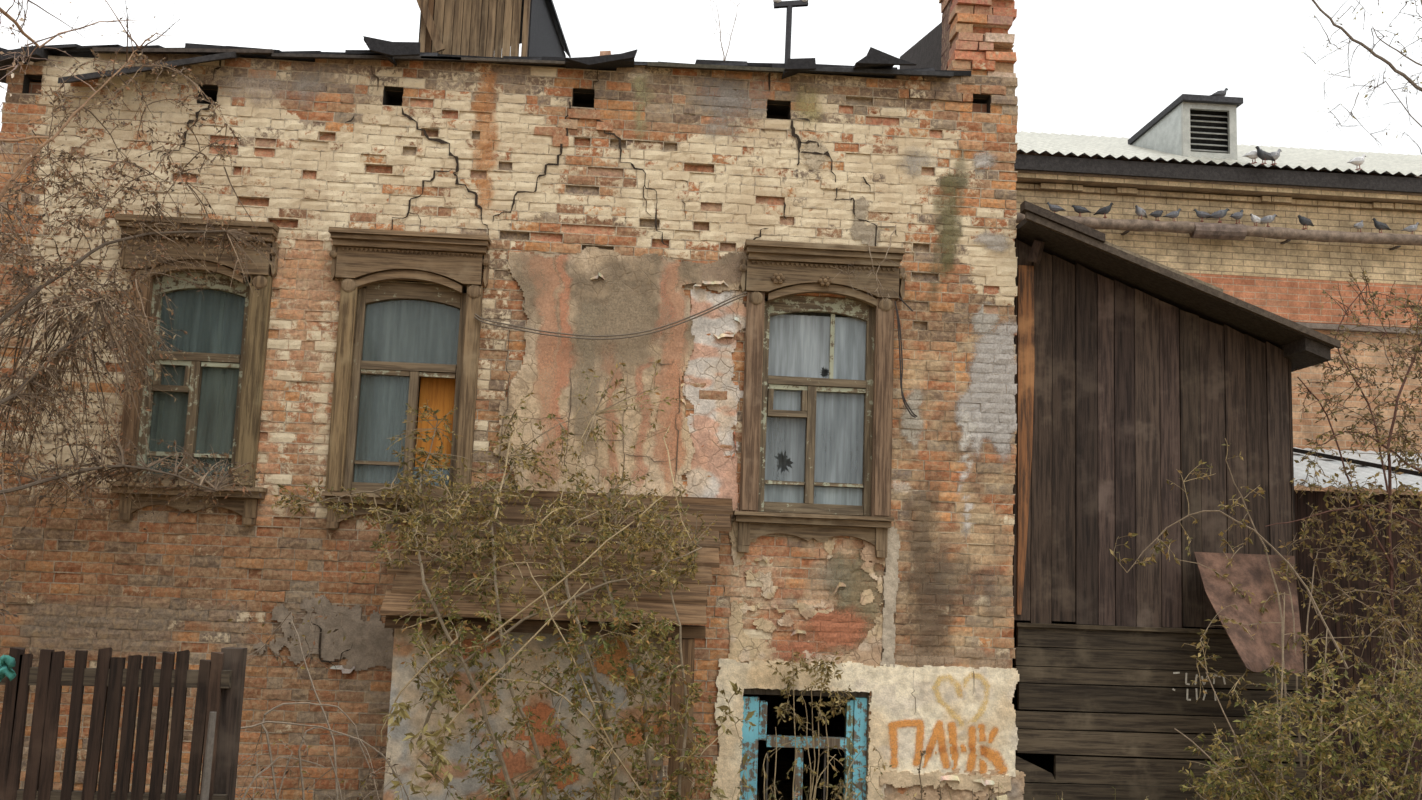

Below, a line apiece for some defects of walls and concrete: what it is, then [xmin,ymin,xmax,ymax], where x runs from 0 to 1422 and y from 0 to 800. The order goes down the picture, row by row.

crack [371,65,686,246]
water stain [705,84,765,134]
crack [790,118,898,246]
water stain [931,155,966,289]
flaking render [680,280,886,668]
water stain [958,410,983,529]
water stain [881,483,1008,669]